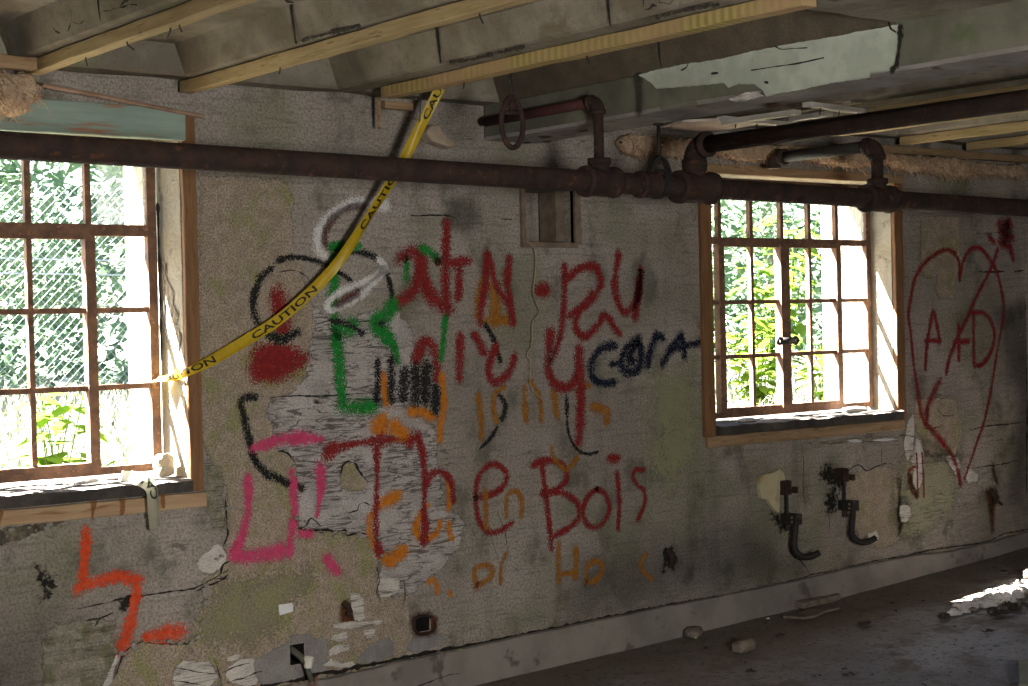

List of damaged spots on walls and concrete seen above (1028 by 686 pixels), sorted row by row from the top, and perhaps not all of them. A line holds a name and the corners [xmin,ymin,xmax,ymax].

peeling [639,21,898,102]
flaking render [41,173,443,686]